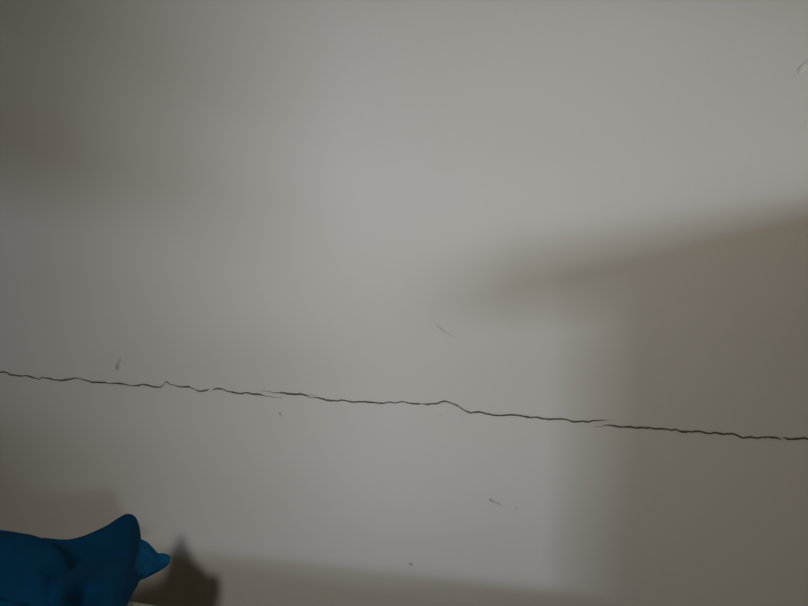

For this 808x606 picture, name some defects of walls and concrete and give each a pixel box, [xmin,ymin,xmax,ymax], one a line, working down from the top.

crack [0,371,808,440]